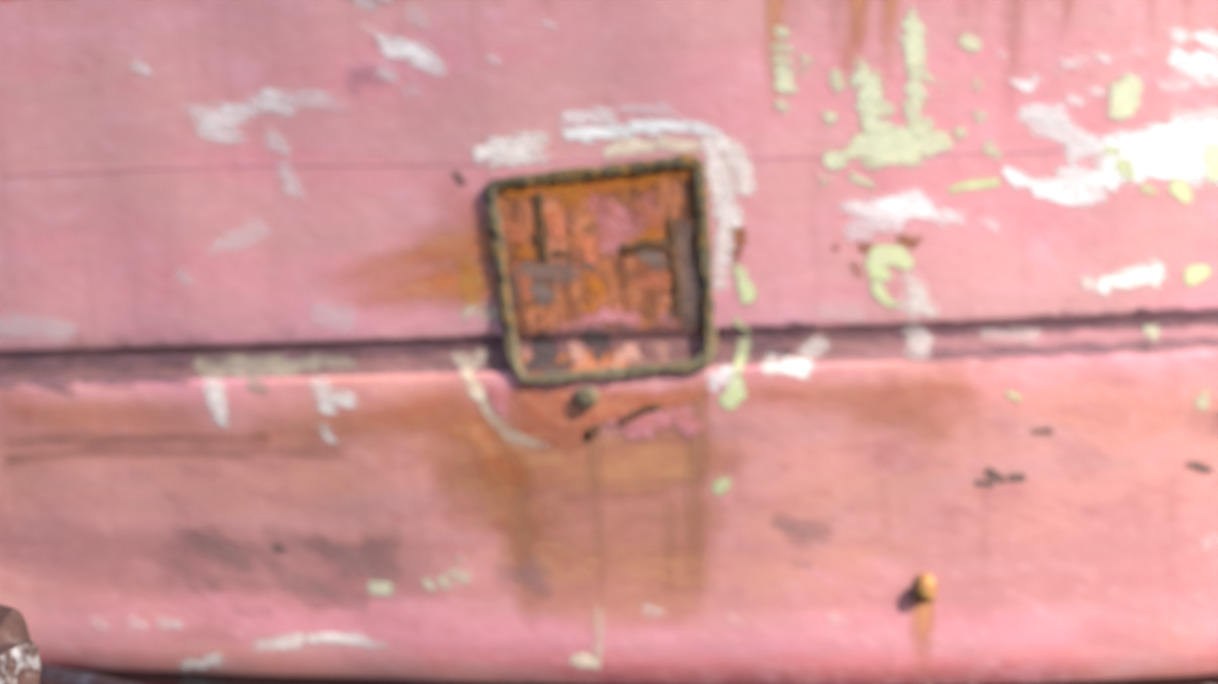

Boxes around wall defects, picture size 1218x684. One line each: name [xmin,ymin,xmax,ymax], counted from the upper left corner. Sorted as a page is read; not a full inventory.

peeling [376,34,446,75]
peeling [1162,29,1218,91]
peeling [470,131,549,167]
peeling [822,7,986,316]
peeling [948,74,1218,208]
peeling [544,106,757,304]
peeling [559,305,641,367]
rust [503,167,710,460]
peeling [707,318,750,410]
peeling [762,357,814,379]
peeling [1184,265,1211,287]
rust [442,408,513,483]